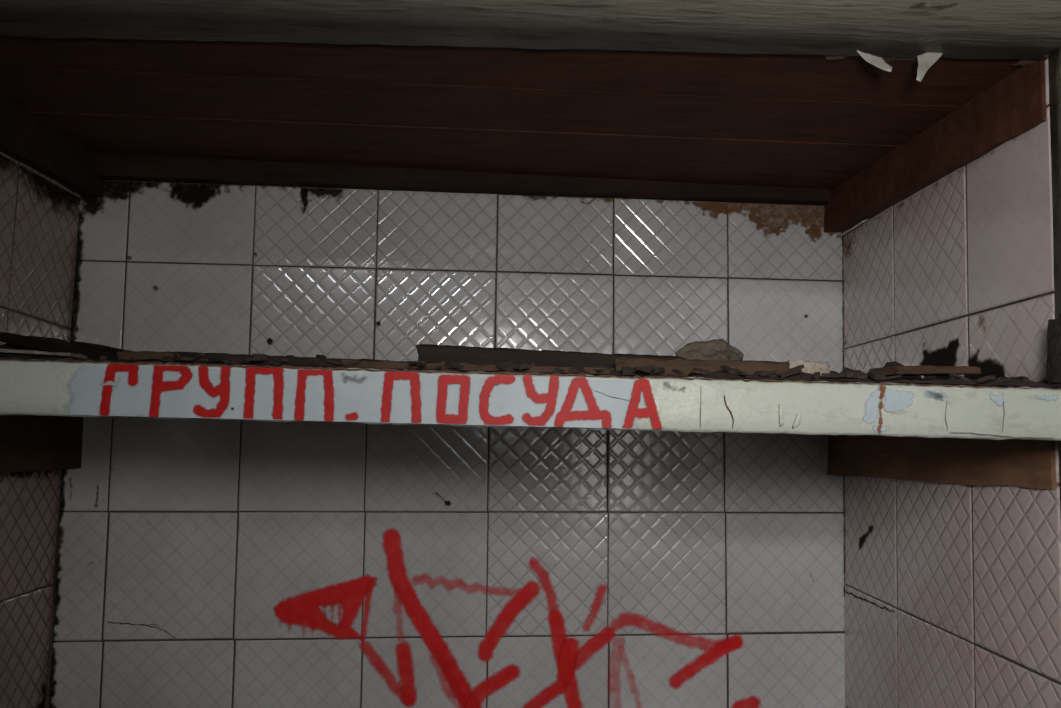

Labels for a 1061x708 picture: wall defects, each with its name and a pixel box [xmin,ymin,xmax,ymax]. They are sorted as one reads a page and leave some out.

peeling [825,50,943,82]